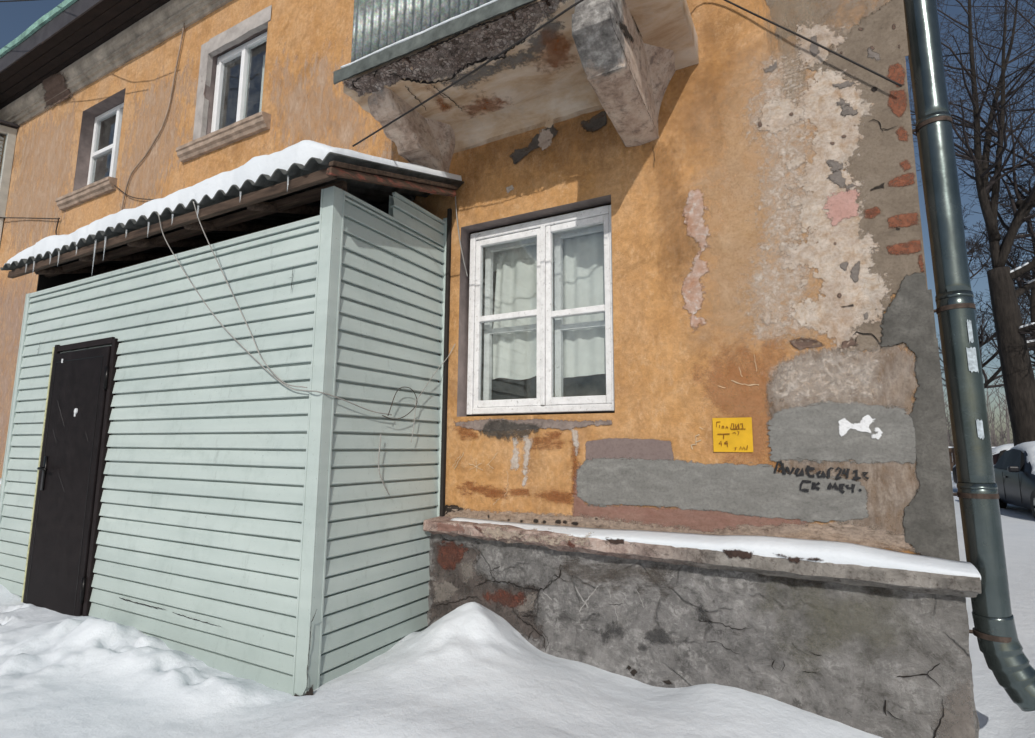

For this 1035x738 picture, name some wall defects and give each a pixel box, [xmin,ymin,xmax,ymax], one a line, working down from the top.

spalling [342,0,569,97]
corrosion [543,31,573,68]
corrosion [467,99,505,116]
flaking render [510,120,558,164]
flaking render [581,111,607,132]
peeling [747,0,928,404]
peeling [681,189,710,331]
water stain [480,420,539,486]
crack [434,565,564,652]
crack [701,621,750,654]
crack [897,663,944,738]